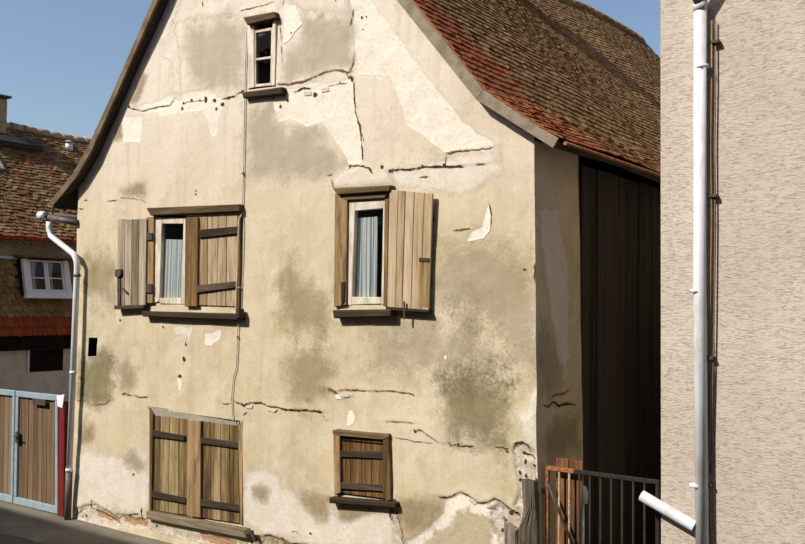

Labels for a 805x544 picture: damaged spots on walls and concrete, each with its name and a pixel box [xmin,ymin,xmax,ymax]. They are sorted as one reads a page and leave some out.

crack [128,90,244,111]
crack [277,51,494,187]
flaking render [467,205,491,242]
crack [222,402,324,417]
crack [327,388,414,398]
flaking render [528,387,537,408]
crack [543,389,575,408]
crack [385,421,472,447]
crack [495,441,538,483]
flaking render [72,442,538,544]
crack [389,499,404,544]
crack [439,492,536,544]